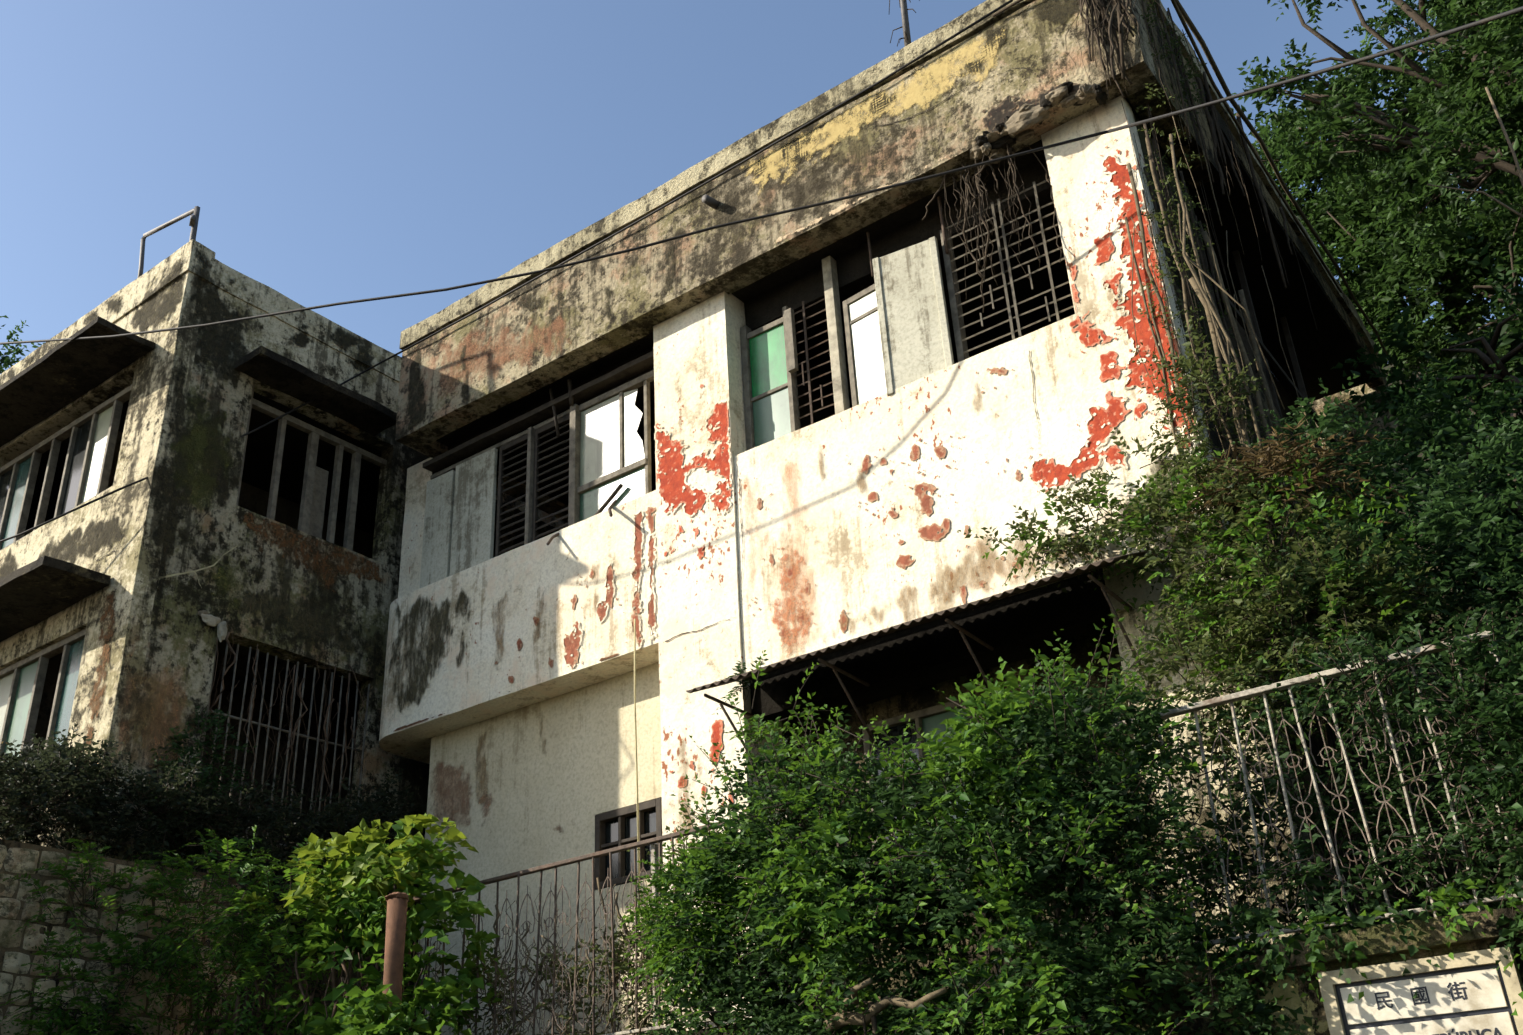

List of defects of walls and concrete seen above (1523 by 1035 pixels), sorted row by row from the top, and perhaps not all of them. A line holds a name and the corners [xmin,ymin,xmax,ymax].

water stain [83,251,257,598]
mould [288,322,318,347]
mould [335,327,373,372]
water stain [408,349,426,430]
water stain [461,345,469,403]
peeling [976,367,1013,394]
peeling [1003,139,1197,498]
peeling [539,399,732,669]
peeling [846,436,987,582]
water stain [238,552,470,713]
peeling [495,636,523,693]
peeling [838,610,848,633]